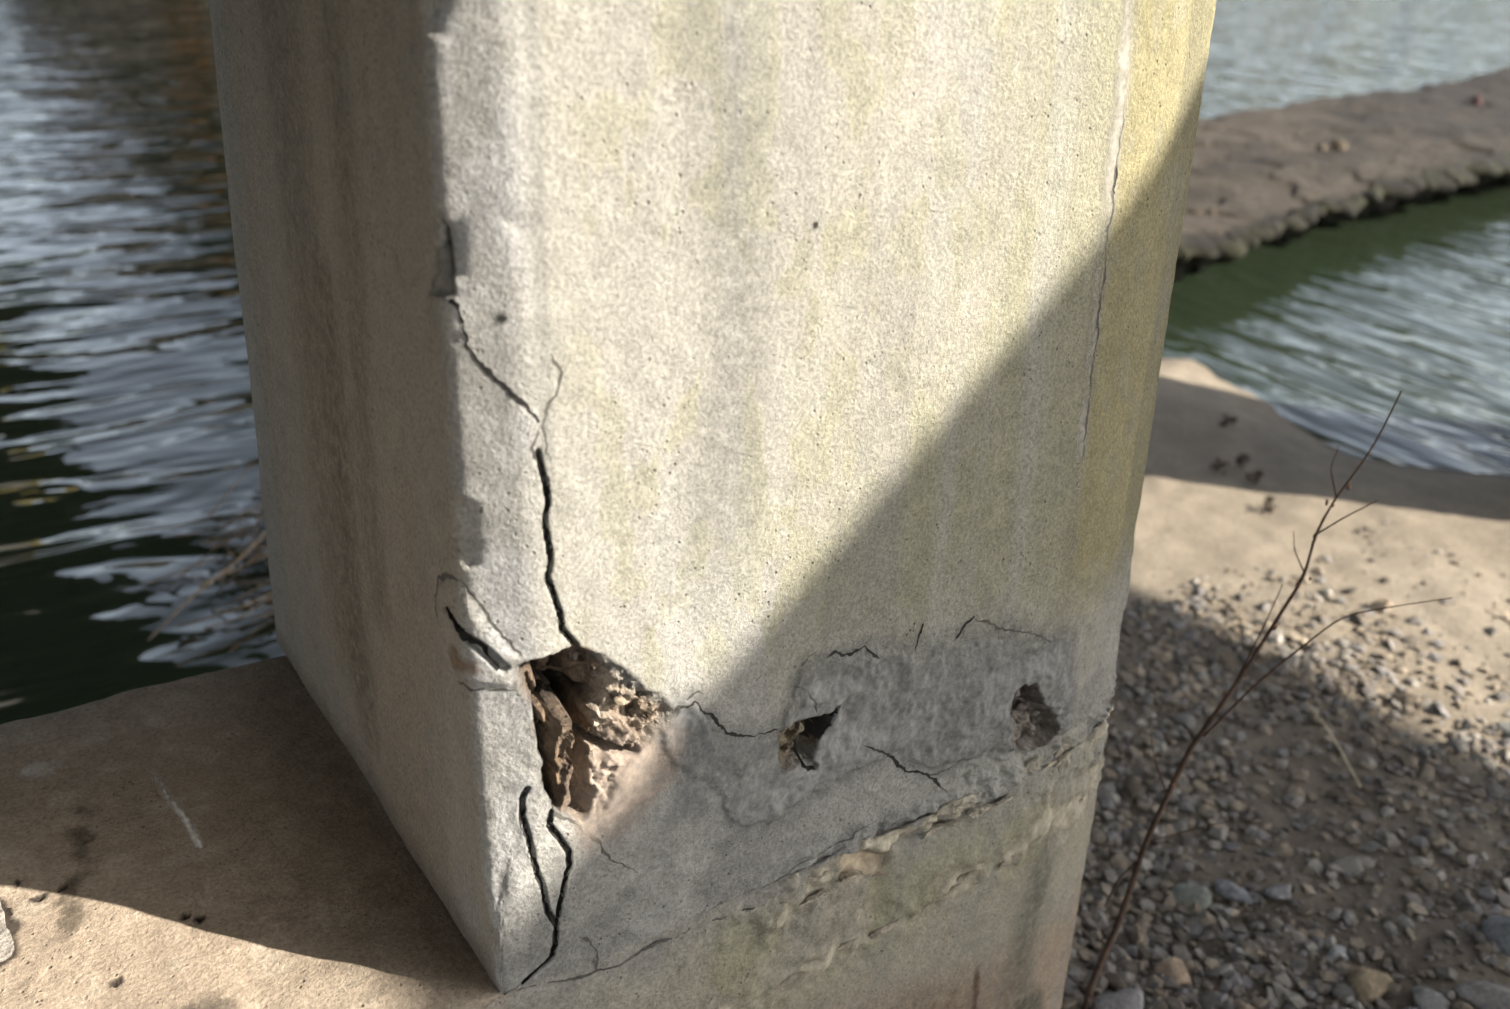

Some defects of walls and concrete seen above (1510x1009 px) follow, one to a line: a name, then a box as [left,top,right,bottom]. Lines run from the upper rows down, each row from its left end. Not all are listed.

crack [449,299,578,646]
spalling [435,572,678,838]
crack [503,787,883,995]
crack [671,690,778,737]
crack [794,646,880,713]
crack [863,745,973,791]
peeling [767,683,1114,1007]
crack [915,616,1059,651]